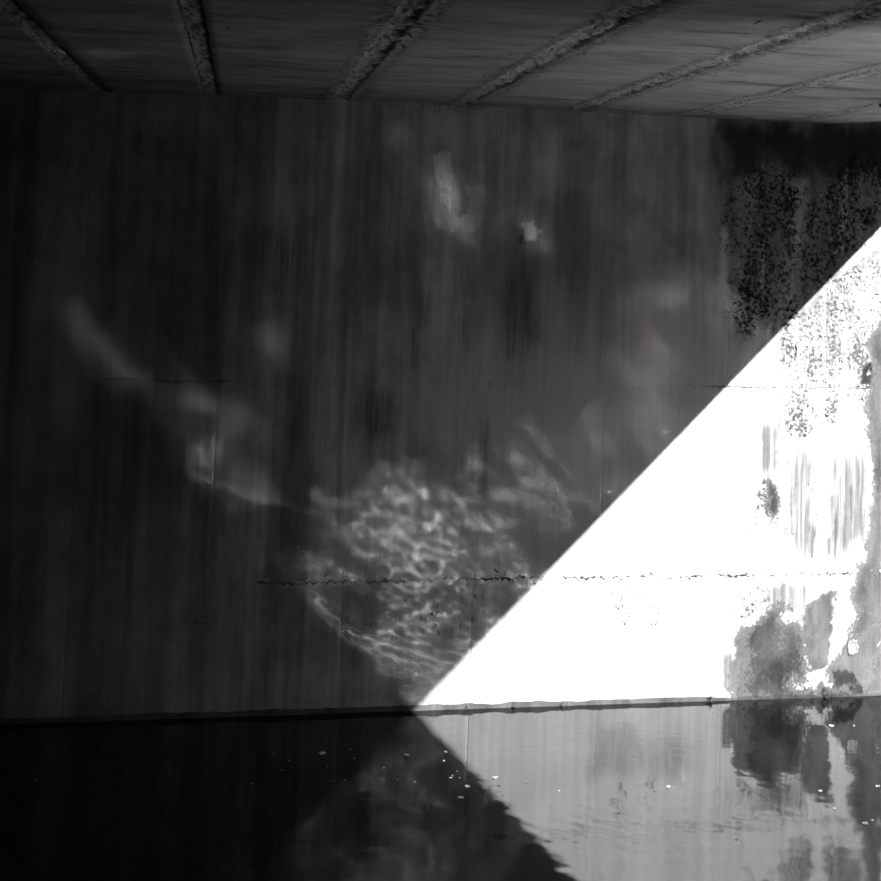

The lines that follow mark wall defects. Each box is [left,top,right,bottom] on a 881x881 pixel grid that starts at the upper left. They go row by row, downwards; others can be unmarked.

damp [714,206,734,321]
damp [783,177,809,257]
peeling [723,158,881,439]
damp [834,180,852,259]
damp [0,314,881,724]
crack [257,555,881,641]